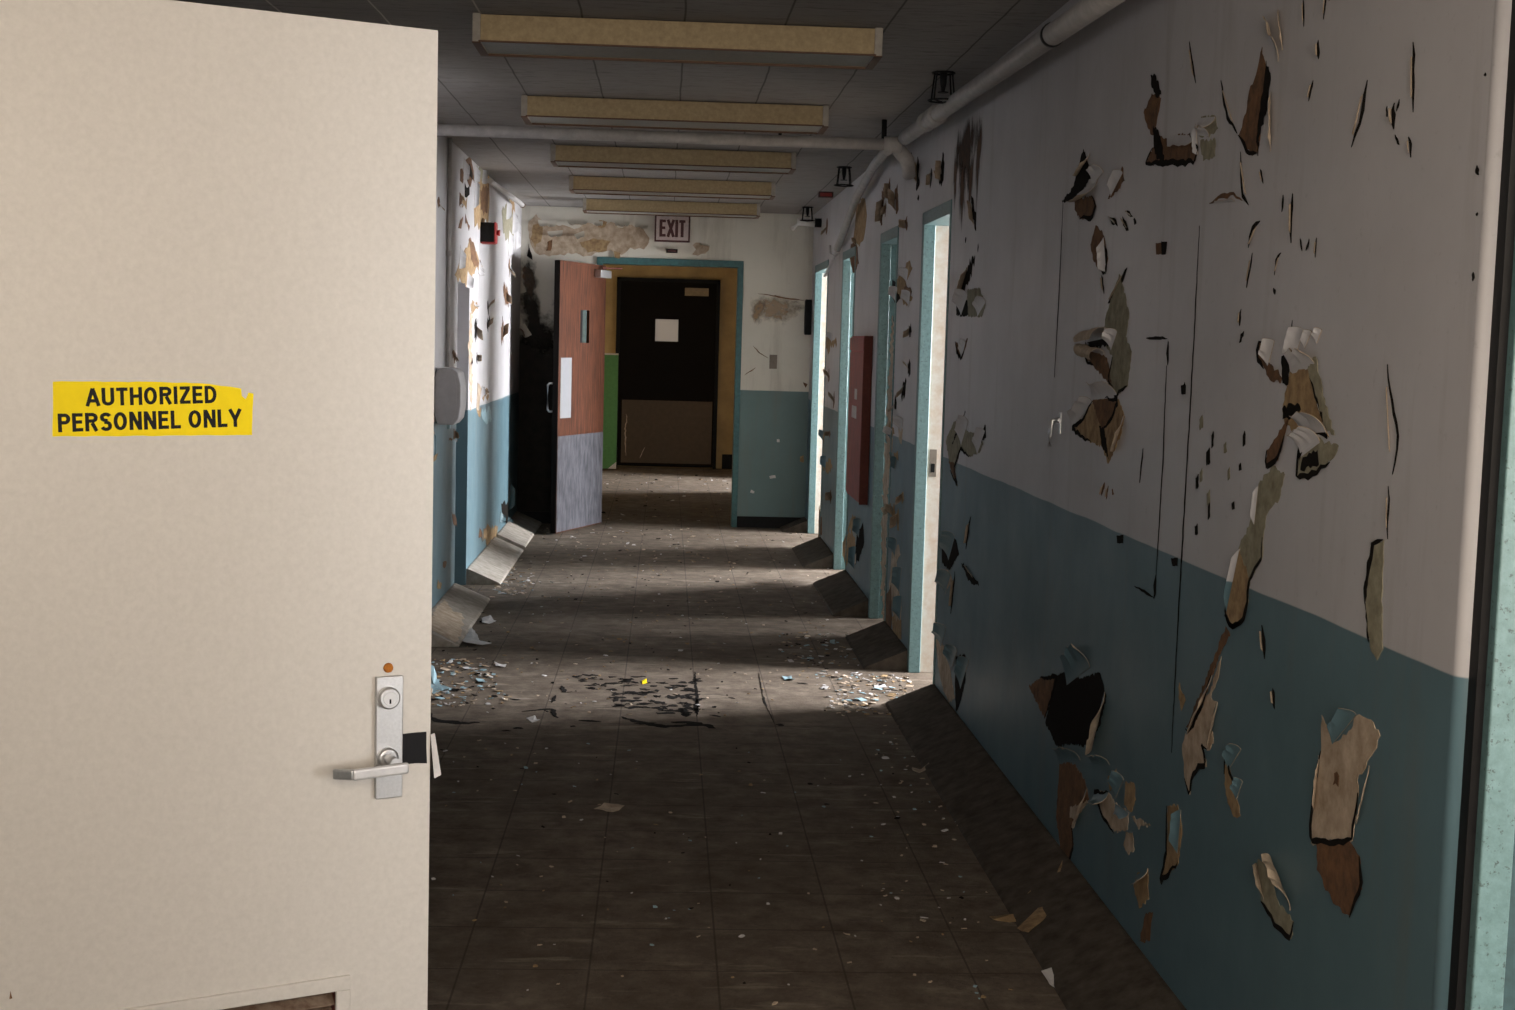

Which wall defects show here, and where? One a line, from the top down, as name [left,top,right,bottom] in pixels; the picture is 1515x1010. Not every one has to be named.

peeling [1144,74,1198,167]
peeling [1238,10,1283,156]
peeling [455,157,649,424]
peeling [955,338,968,360]
peeling [952,287,986,318]
peeling [1062,149,1132,463]
peeling [946,413,986,486]
peeling [1029,320,1339,943]
peeling [1363,539,1384,660]
peeling [1309,708,1380,918]
peeling [990,890,1047,932]